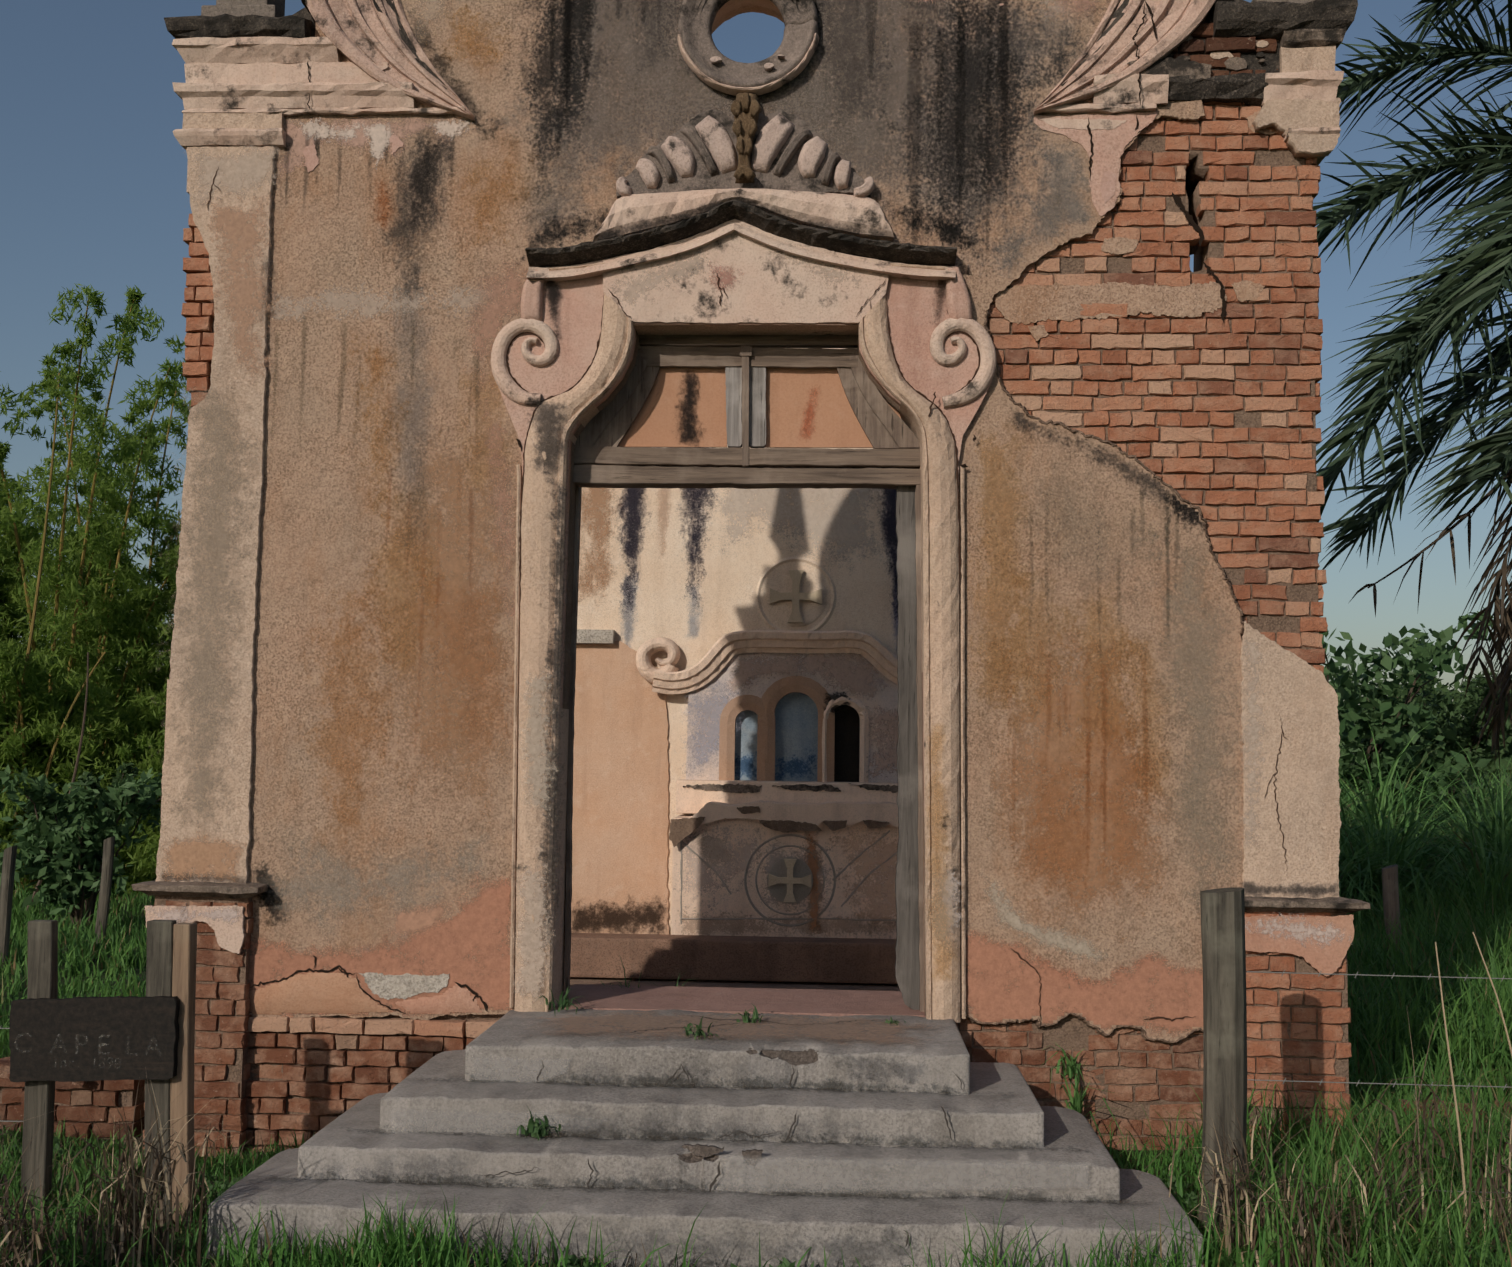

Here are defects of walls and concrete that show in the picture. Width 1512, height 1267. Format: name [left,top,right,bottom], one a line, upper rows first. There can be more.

spalling [181,213,215,407]
crack [1172,192,1227,322]
spalling [984,101,1328,674]
water stain [621,488,643,603]
water stain [686,488,707,562]
crack [1265,714,1287,871]
peeling [148,907,237,923]
spalling [359,972,449,1000]
peeling [1245,915,1344,945]
spalling [243,1016,498,1152]